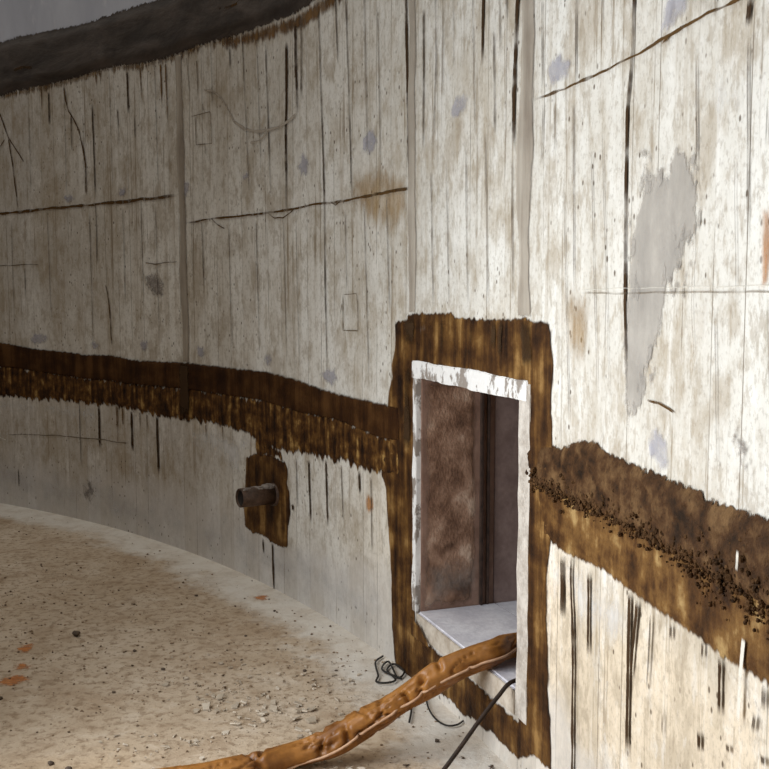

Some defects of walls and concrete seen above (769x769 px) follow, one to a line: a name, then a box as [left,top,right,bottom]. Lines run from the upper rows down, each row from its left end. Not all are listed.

crack [543,0,739,98]
crack [0,88,172,215]
crack [191,187,407,229]
peeling [623,148,701,415]
rust [0,312,769,769]
water stain [560,559,590,769]
water stain [625,595,638,748]
water stain [737,640,745,719]